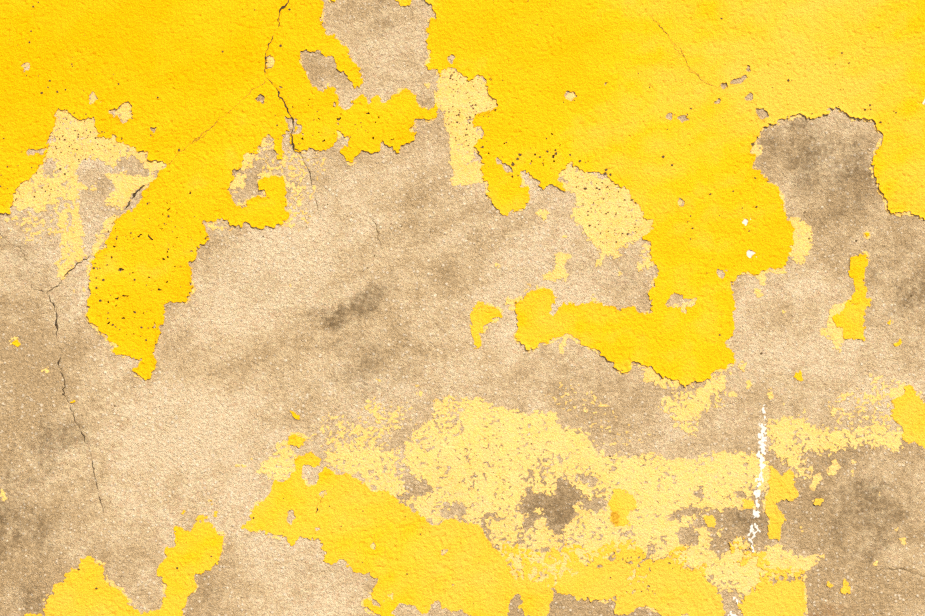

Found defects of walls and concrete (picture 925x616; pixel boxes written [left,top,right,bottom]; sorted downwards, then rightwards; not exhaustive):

peeling [714,65,751,104]
peeling [109,101,133,123]
crack [169,0,321,216]
peeling [665,293,697,314]
crack [31,258,104,512]
peeling [765,406,903,478]
peeling [758,461,771,496]
peeling [763,543,825,577]